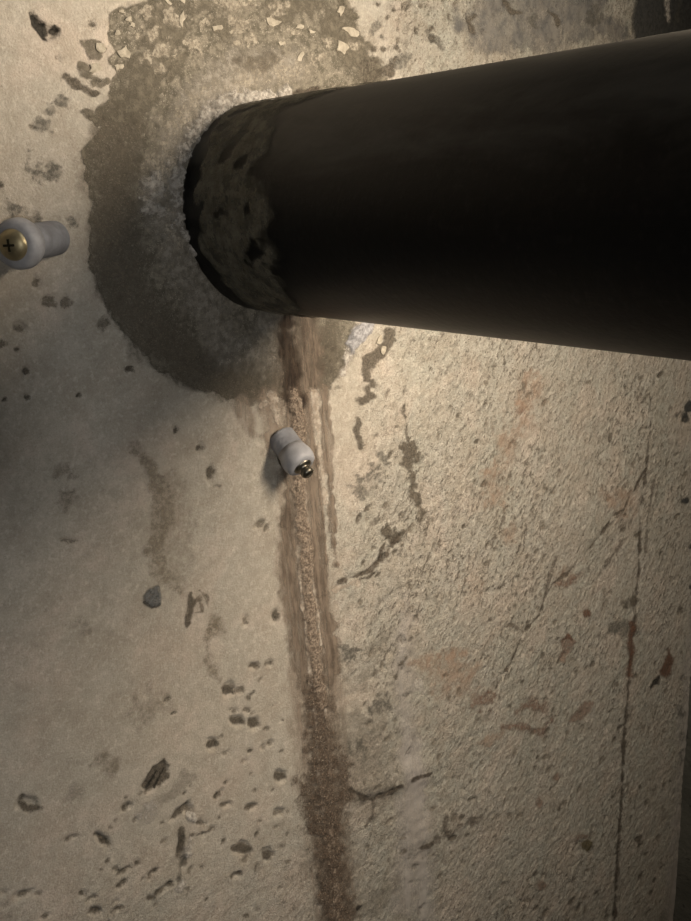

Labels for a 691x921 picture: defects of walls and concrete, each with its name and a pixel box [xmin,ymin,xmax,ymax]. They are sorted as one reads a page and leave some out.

leakage [298,322,374,376]
crack [588,467,648,576]
crack [495,557,574,689]
crack [349,772,432,828]